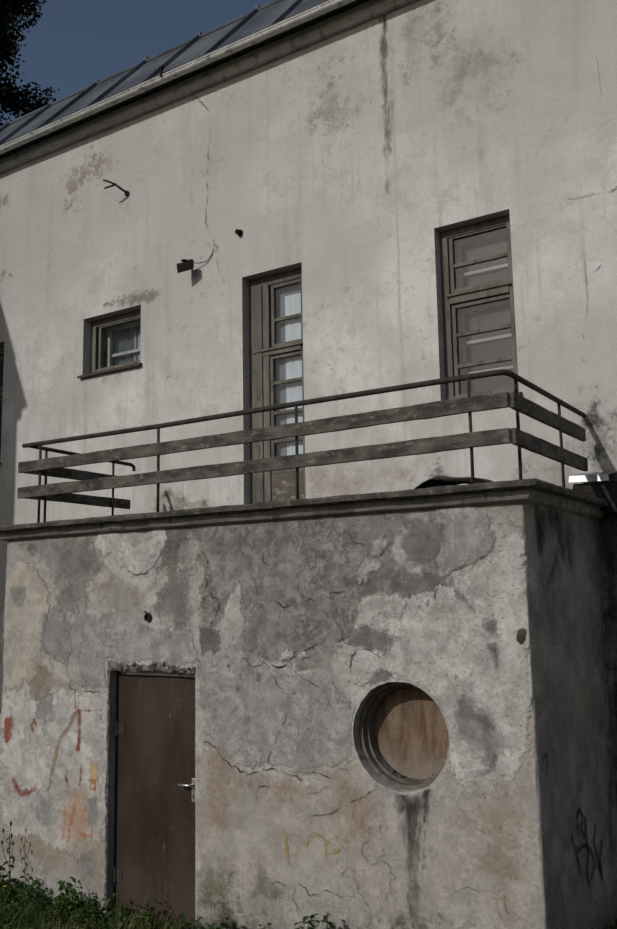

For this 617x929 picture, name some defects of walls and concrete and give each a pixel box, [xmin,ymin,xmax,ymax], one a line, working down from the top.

mould [583,403,610,429]
crack [227,622,380,692]
flaking render [199,516,410,671]
damp [534,506,617,922]
crack [203,718,401,911]
damp [401,790,428,852]